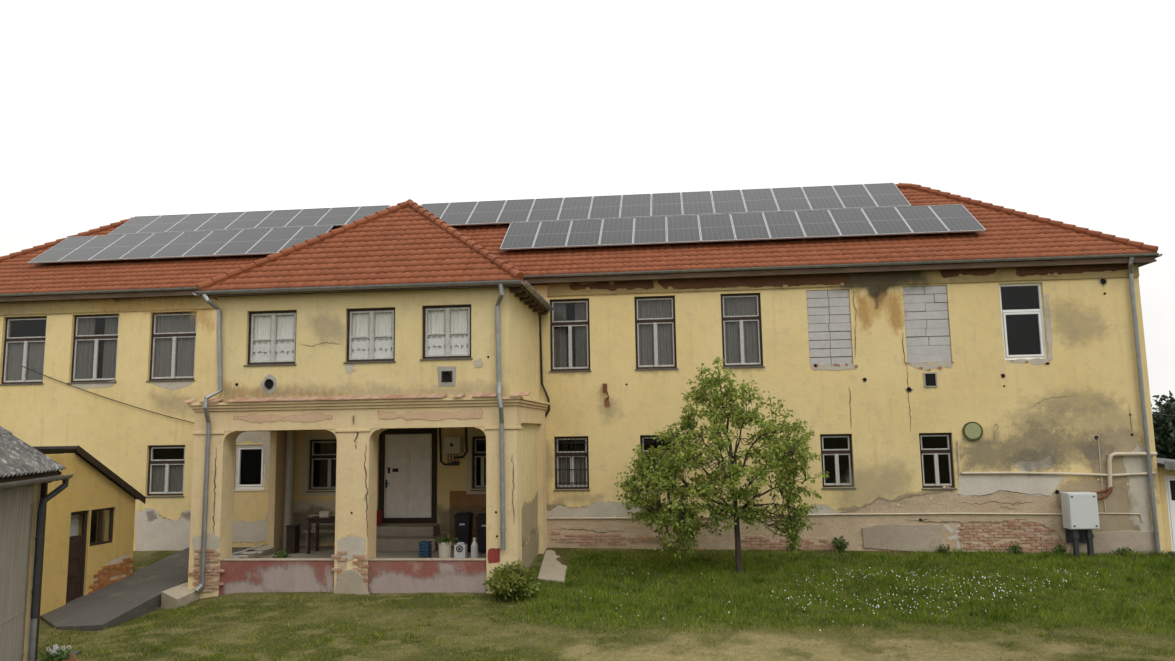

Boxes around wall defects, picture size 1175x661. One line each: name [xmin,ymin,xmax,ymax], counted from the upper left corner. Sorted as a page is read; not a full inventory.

crack [902,332,913,431]
flaking render [522,433,1153,554]
damp [969,429,1139,507]
flaking render [88,508,268,594]
flaking render [295,509,369,587]